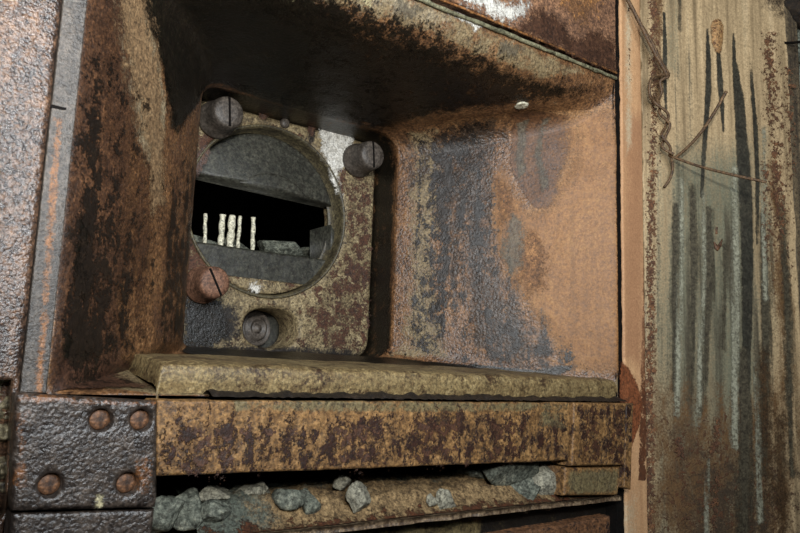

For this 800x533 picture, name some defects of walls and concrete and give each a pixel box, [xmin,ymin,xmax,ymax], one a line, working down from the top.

rust [50,0,229,392]
rust [171,416,300,481]
rust [385,0,661,533]
leakage [671,29,773,533]
rust [755,351,791,533]
rust [760,31,798,258]
leakage [779,195,797,478]